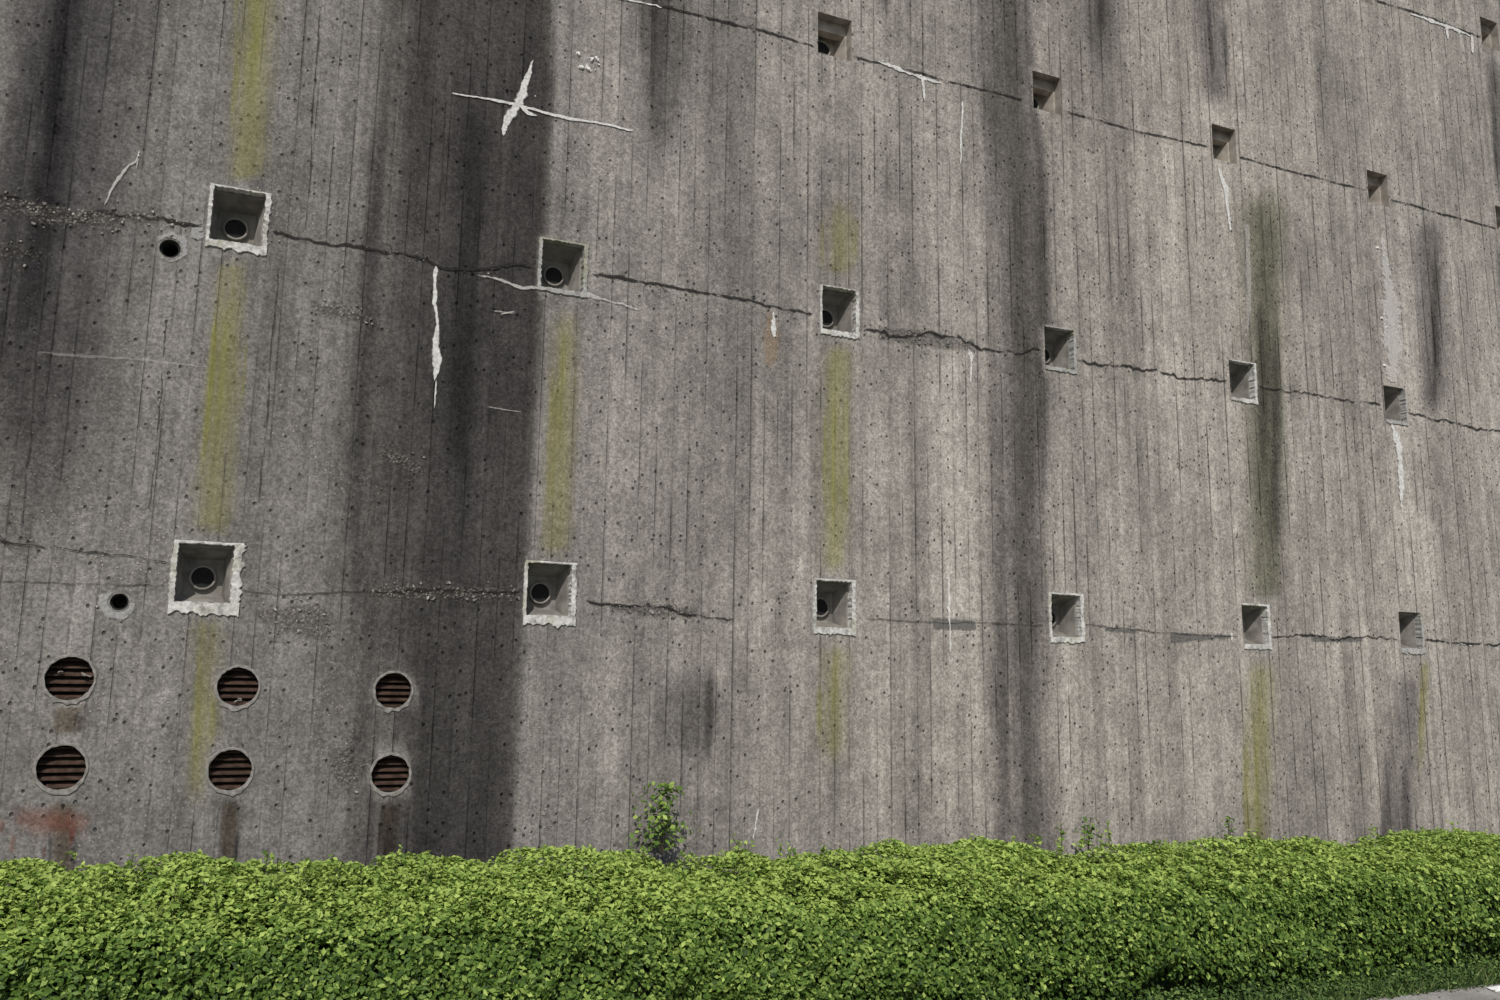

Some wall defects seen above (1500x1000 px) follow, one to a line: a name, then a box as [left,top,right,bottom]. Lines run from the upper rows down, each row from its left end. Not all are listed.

crack [658,5,815,47]
water stain [453,61,633,135]
crack [854,56,1022,100]
crack [1066,111,1495,228]
crack [255,7,535,502]
water stain [477,273,538,289]
crack [592,270,813,315]
water stain [432,266,442,407]
crack [863,328,1040,357]
crack [0,188,202,600]
crack [1079,359,1500,431]
crack [586,600,735,624]